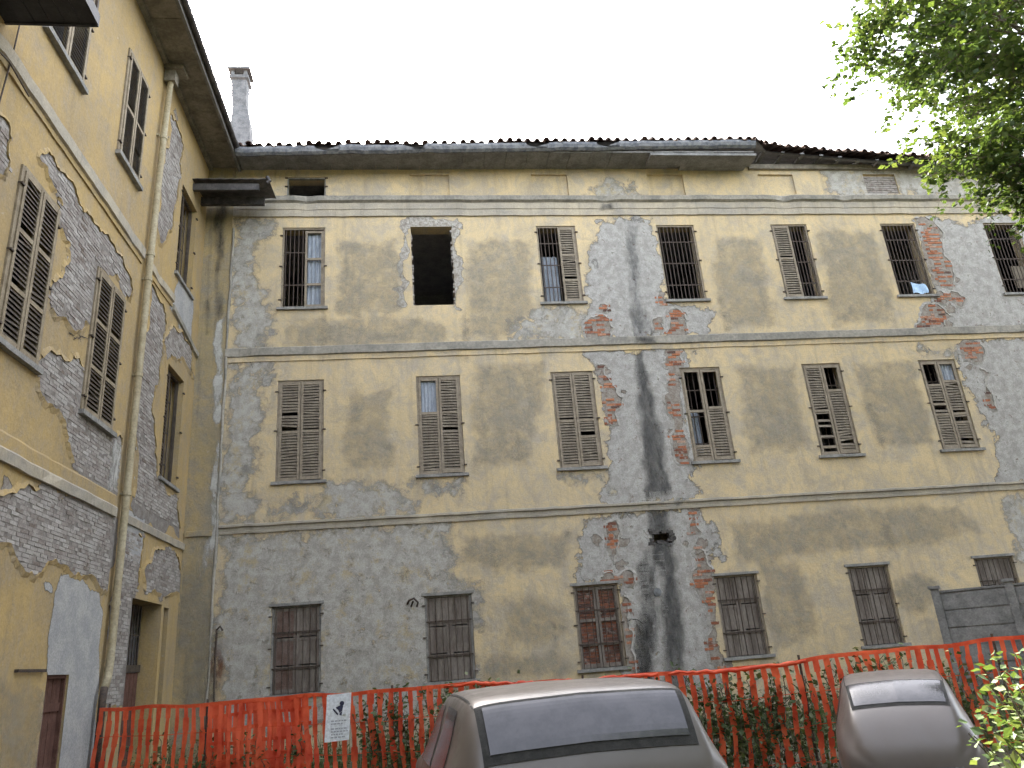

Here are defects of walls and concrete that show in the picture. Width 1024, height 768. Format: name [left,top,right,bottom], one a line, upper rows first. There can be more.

flaking render [36,148,133,336]
flaking render [157,108,184,249]
peeling [230,217,278,348]
flaking render [393,216,464,311]
peeling [506,215,716,340]
flaking render [0,283,195,716]
peeling [211,362,485,731]
peeling [556,349,733,694]
damp [637,354,670,497]
damp [635,510,683,687]
peeling [912,214,1024,563]